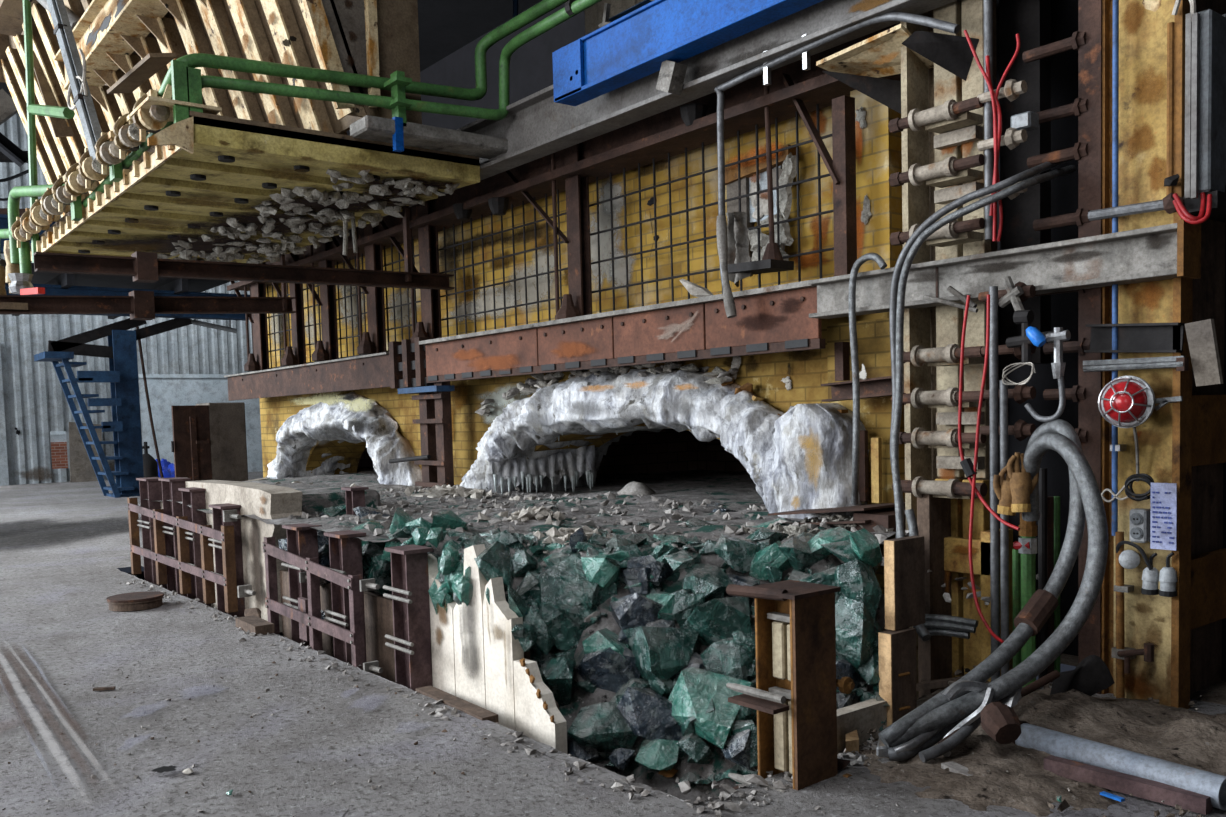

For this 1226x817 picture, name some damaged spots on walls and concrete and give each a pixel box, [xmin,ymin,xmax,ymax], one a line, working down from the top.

rust [1125,4,1143,30]
rust [1129,128,1166,188]
spalling [748,152,797,261]
leakage [450,251,554,321]
rust [741,299,800,329]
rust [454,349,516,370]